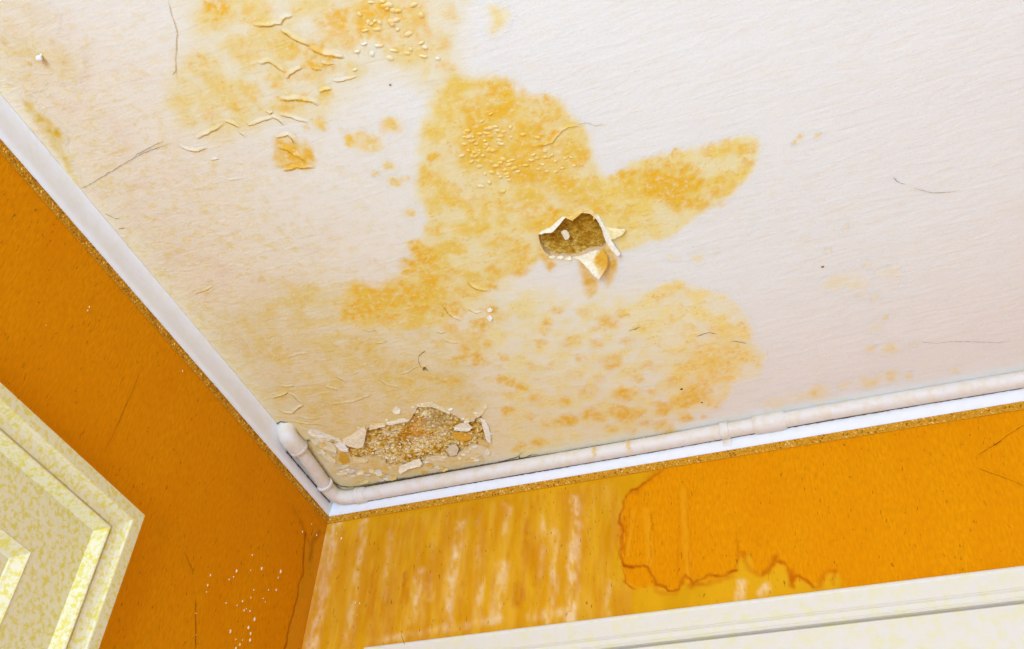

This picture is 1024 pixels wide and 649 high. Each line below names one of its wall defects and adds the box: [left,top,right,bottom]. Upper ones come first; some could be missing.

crack [168,2,178,75]
peeling [253,12,344,78]
peeling [180,74,357,172]
crack [80,142,168,189]
leakage [150,0,770,490]
spalling [538,209,626,280]
spalling [308,401,500,485]
leakage [283,468,847,649]